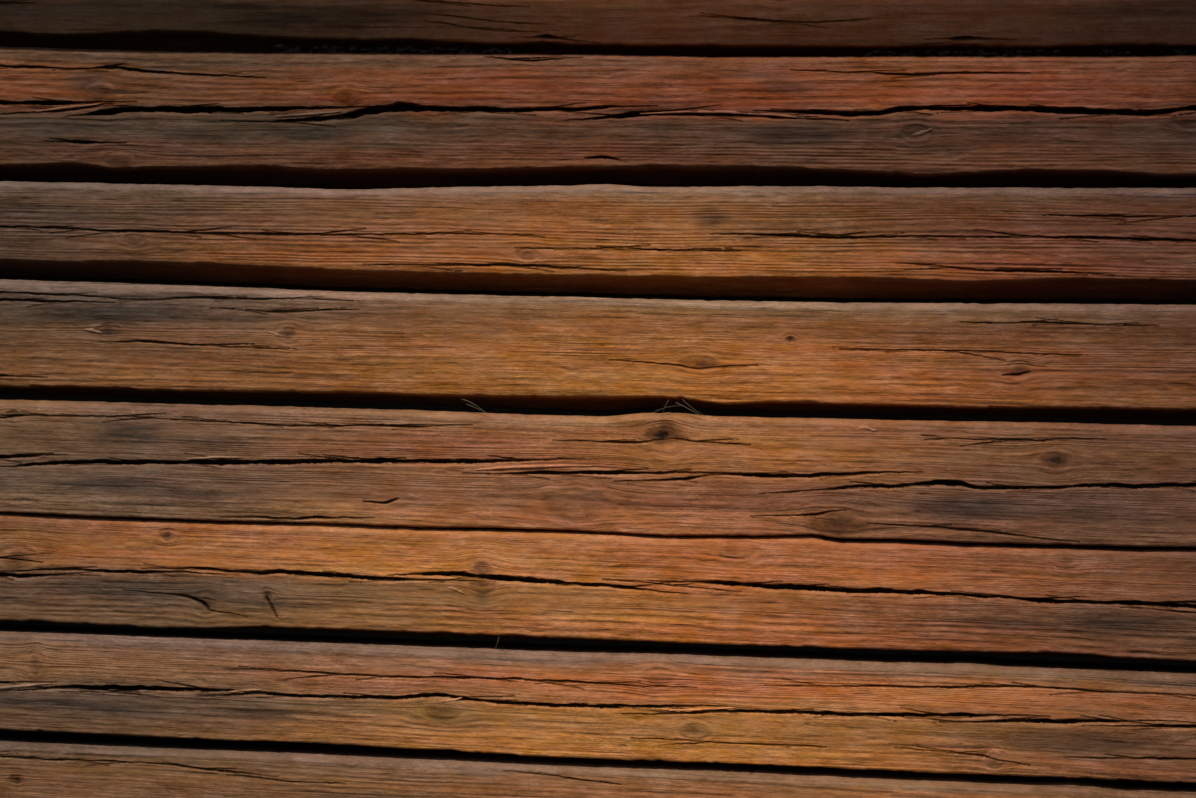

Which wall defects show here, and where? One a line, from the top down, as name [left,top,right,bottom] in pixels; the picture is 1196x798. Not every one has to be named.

crack [0,63,1196,144]
crack [0,373,48,381]
crack [0,411,1196,542]
crack [0,552,1196,617]
crack [0,666,1196,765]
crack [0,751,346,784]